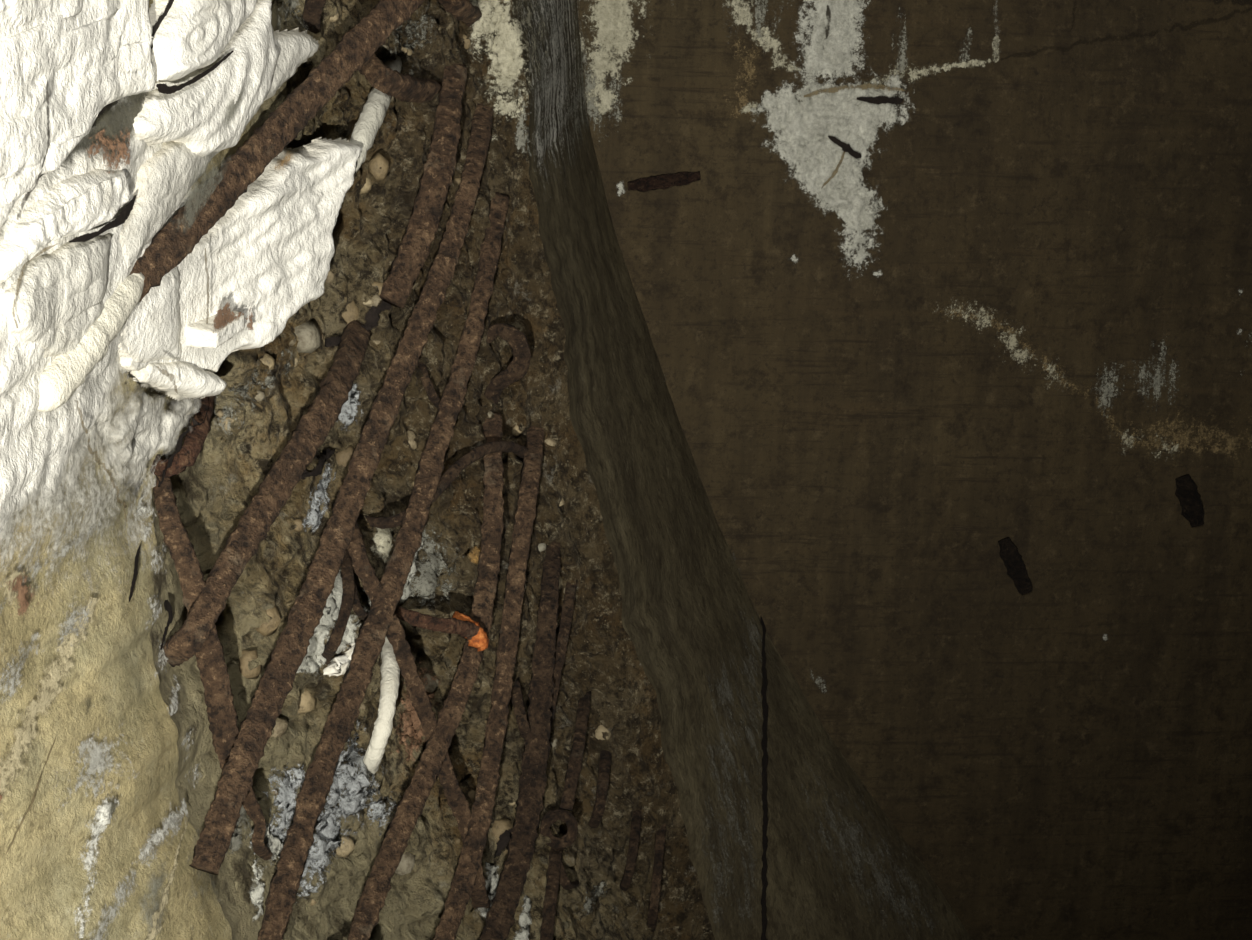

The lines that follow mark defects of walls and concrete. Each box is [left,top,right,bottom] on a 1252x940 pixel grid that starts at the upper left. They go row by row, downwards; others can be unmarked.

leakage [460,0,647,183]
leakage [722,0,916,278]
crack [864,8,1000,88]
rust [212,303,253,333]
spalling [150,0,715,940]
rust [388,681,426,764]